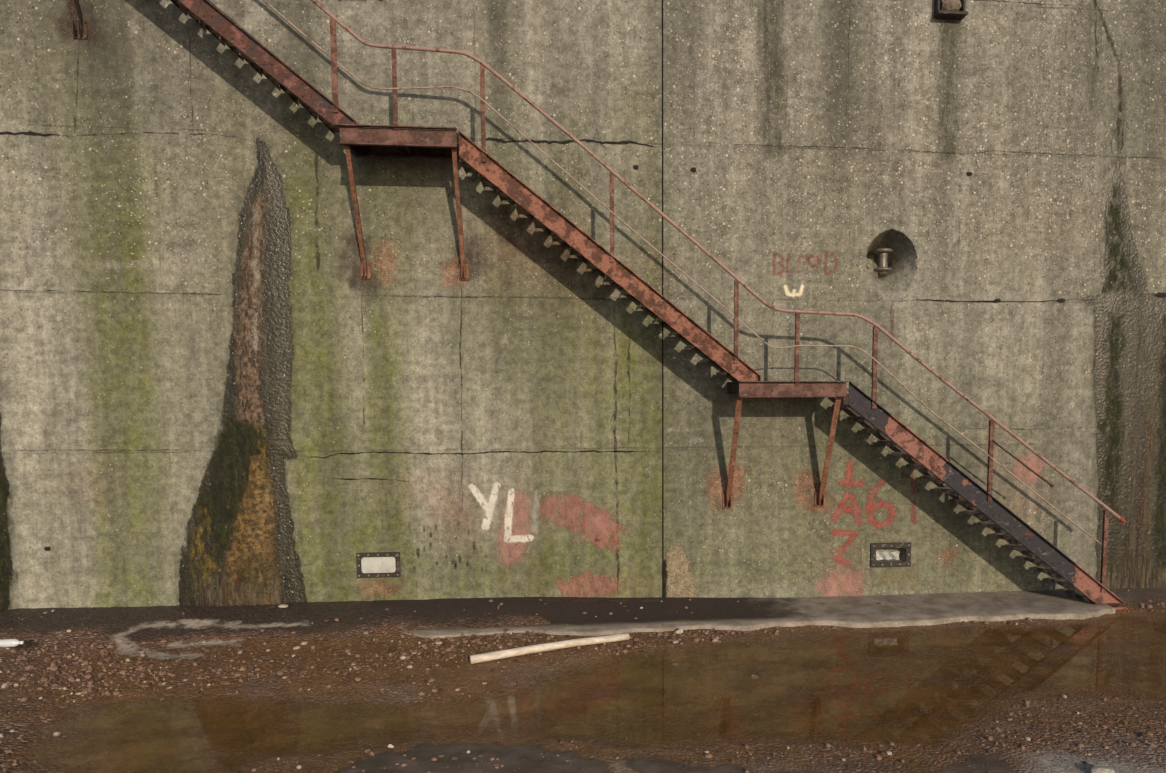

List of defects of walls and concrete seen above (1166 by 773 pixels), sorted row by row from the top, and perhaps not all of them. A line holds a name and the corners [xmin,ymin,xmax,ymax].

crack [0,36,236,138]
crack [478,137,680,148]
crack [906,0,1159,159]
leakage [0,414,17,611]
leakage [112,139,308,659]
crack [311,289,654,592]
spalling [662,546,697,598]
crack [917,297,1075,305]
leakage [1081,159,1166,589]